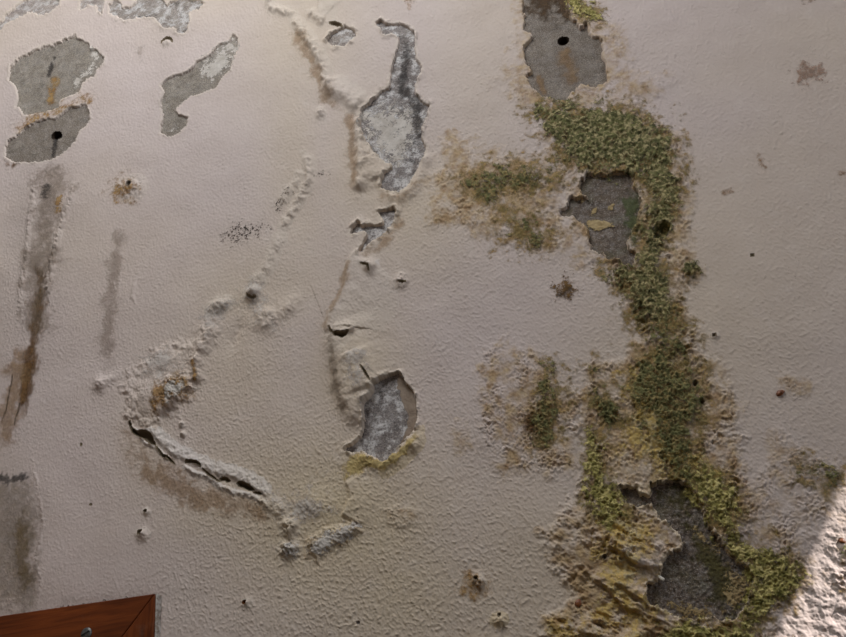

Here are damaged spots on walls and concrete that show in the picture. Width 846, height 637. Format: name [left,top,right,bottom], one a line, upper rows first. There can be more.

peeling [0,0,62,33]
peeling [77,0,206,37]
peeling [3,31,106,166]
peeling [158,31,240,139]
damp [797,61,824,85]
damp [0,269,44,439]
damp [550,270,578,300]
peeling [341,0,846,637]
crack [128,419,272,503]